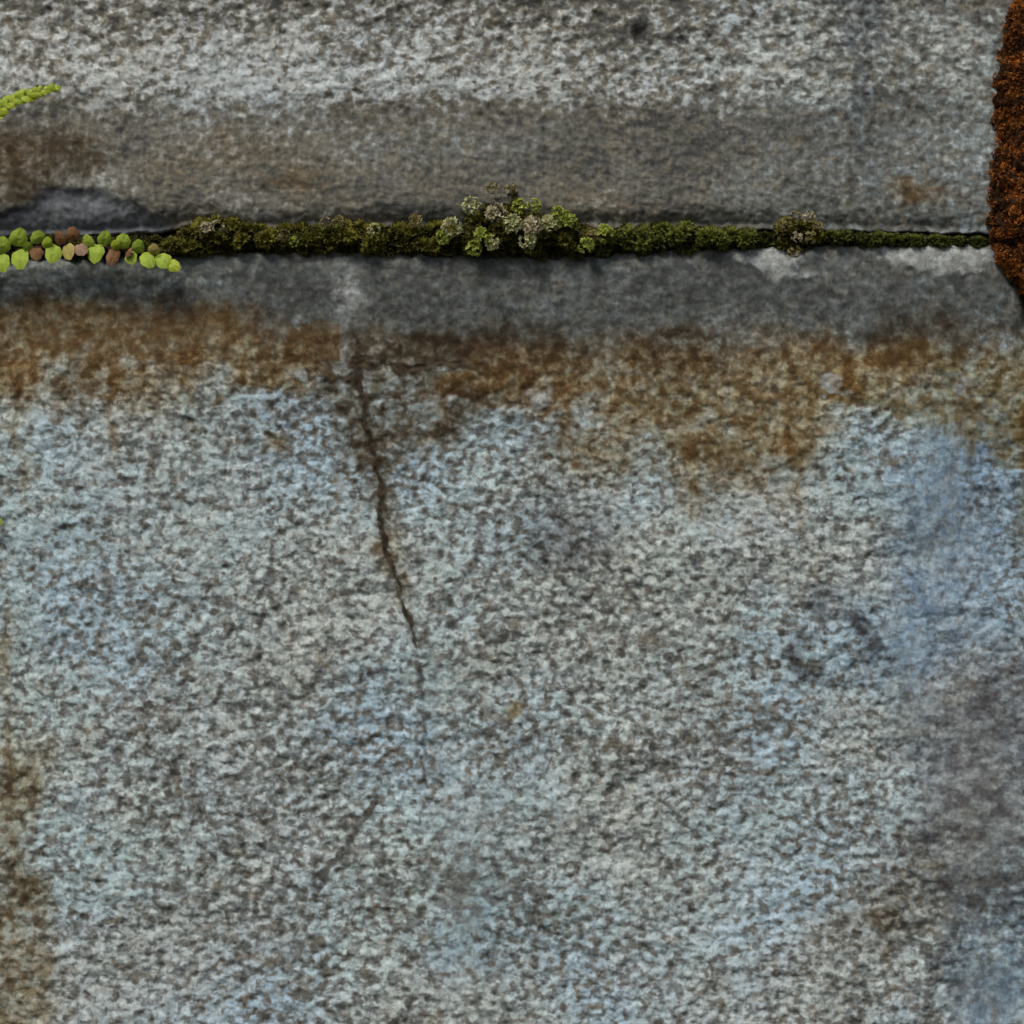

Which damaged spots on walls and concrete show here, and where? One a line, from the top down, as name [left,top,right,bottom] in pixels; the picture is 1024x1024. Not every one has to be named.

crack [312,333,478,786]
crack [311,794,379,882]